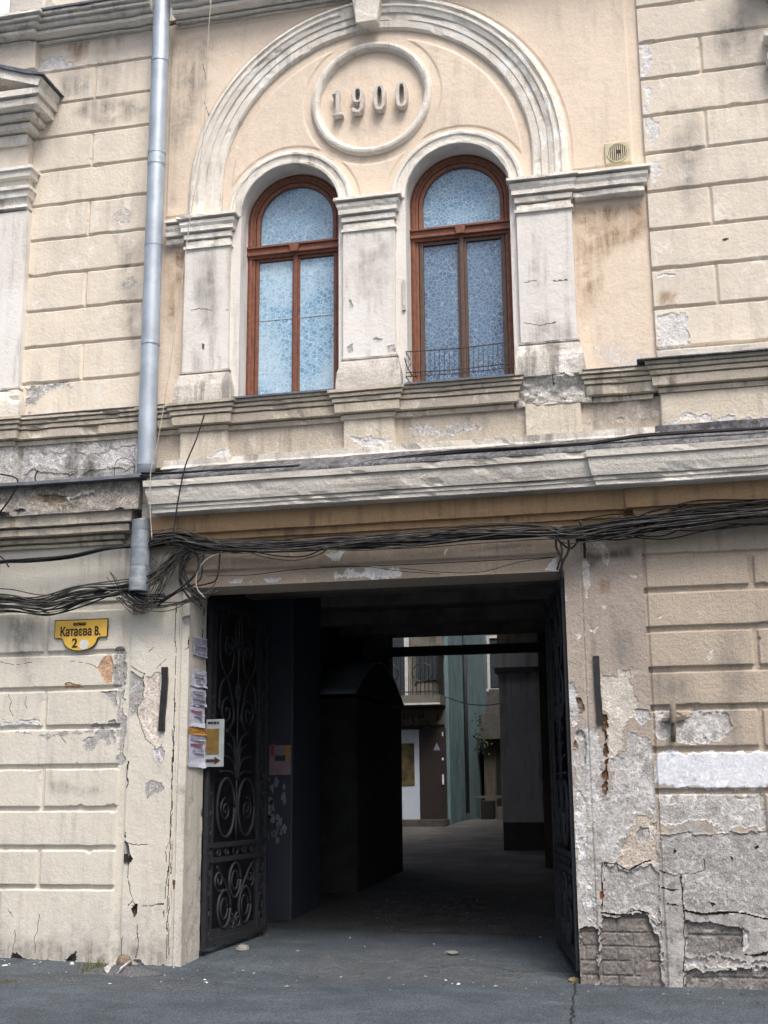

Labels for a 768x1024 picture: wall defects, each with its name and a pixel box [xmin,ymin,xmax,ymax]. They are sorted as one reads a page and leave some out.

peeling [656,312,691,351]
spalling [518,372,588,404]
peeling [409,420,485,442]
spalling [21,443,136,507]
peeling [324,551,402,581]
peeling [0,646,165,767]
peeling [145,780,164,799]
crack [121,606,189,959]
spalling [569,668,768,990]
crack [600,859,768,988]